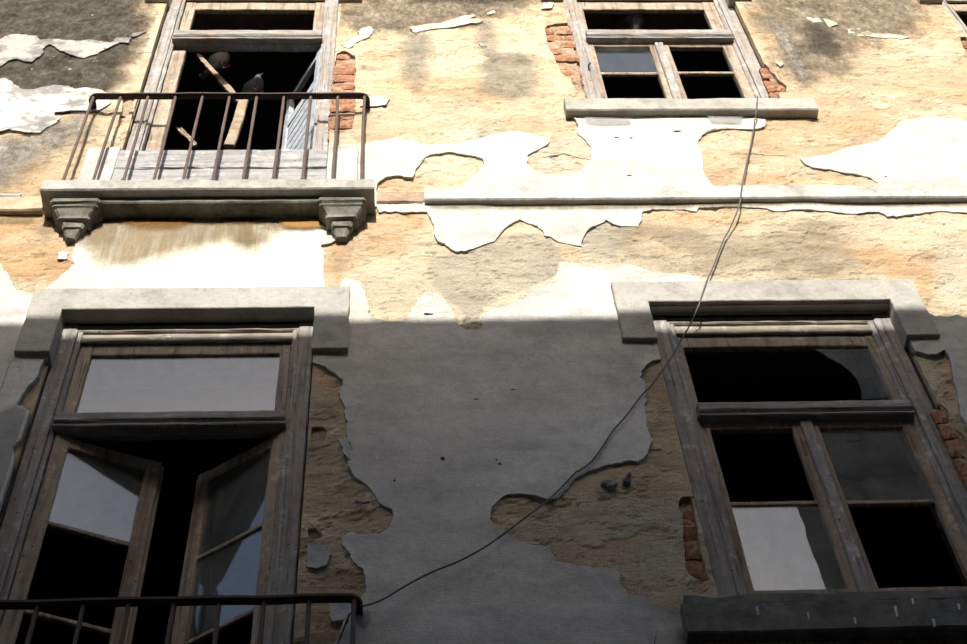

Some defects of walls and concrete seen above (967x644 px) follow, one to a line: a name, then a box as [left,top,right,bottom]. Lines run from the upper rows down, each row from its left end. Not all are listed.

peeling [0,0,167,197]
water stain [341,0,546,33]
peeling [327,0,591,192]
peeling [697,0,967,186]
water stain [753,0,924,86]
peeling [0,214,75,293]
peeling [322,208,967,332]
peeling [293,365,393,644]
peeling [491,362,719,609]
peeling [912,352,967,490]